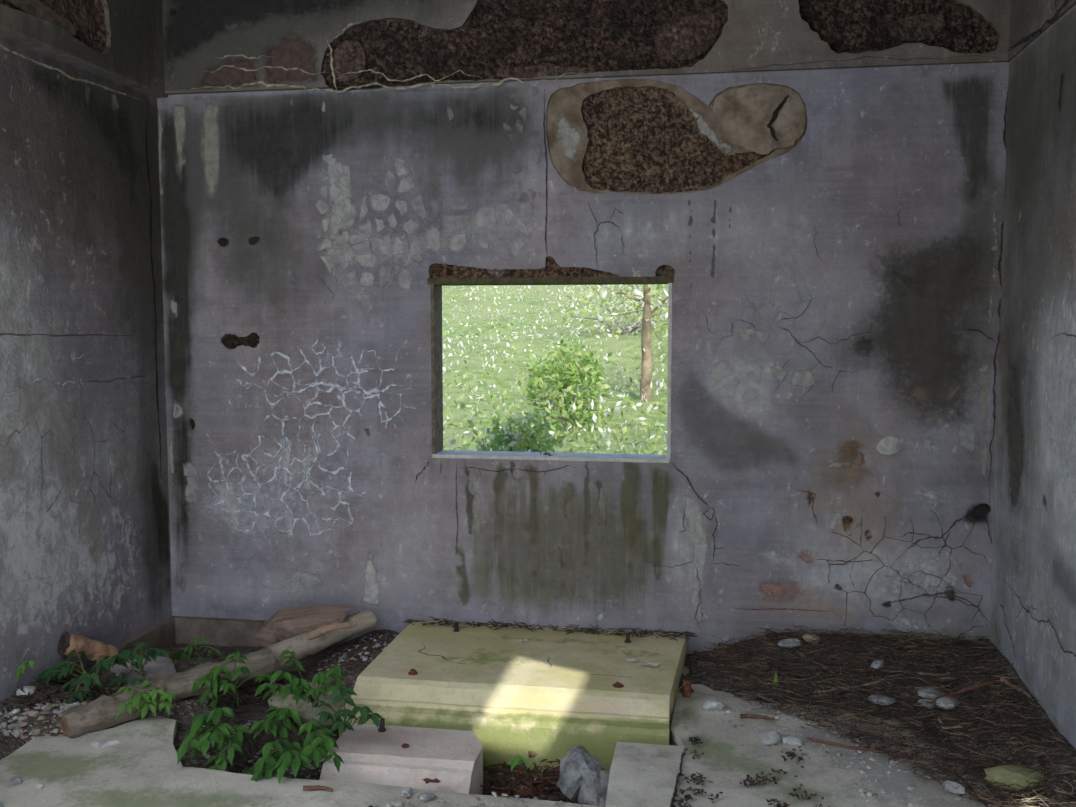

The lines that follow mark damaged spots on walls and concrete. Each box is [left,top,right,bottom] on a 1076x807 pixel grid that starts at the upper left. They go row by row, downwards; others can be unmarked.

spalling [0,0,111,54]
spalling [191,0,807,194]
spalling [798,0,1001,54]
crack [1002,89,1010,148]
crack [0,106,161,526]
water stain [151,101,414,586]
peeling [316,154,619,313]
water stain [856,238,989,476]
crack [797,174,1076,657]
water stain [457,550,469,604]
water stain [465,462,669,621]
crack [641,465,741,633]